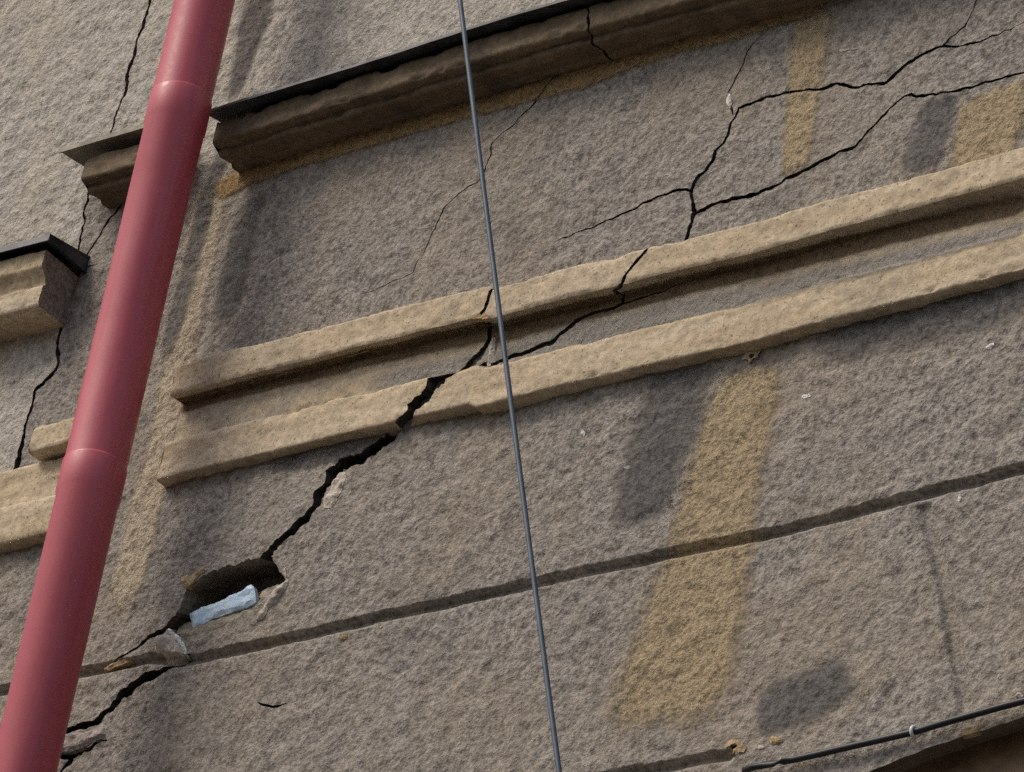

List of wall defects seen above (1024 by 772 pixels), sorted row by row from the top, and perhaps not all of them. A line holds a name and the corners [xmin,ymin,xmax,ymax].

crack [76,192,122,277]
crack [110,0,151,133]
crack [361,76,557,294]
crack [556,0,1024,242]
crack [13,323,64,469]
crack [260,248,682,562]
damp [111,188,1024,609]
hole [169,558,289,642]
damp [617,367,776,723]
crack [60,612,193,772]
crack [258,701,287,709]